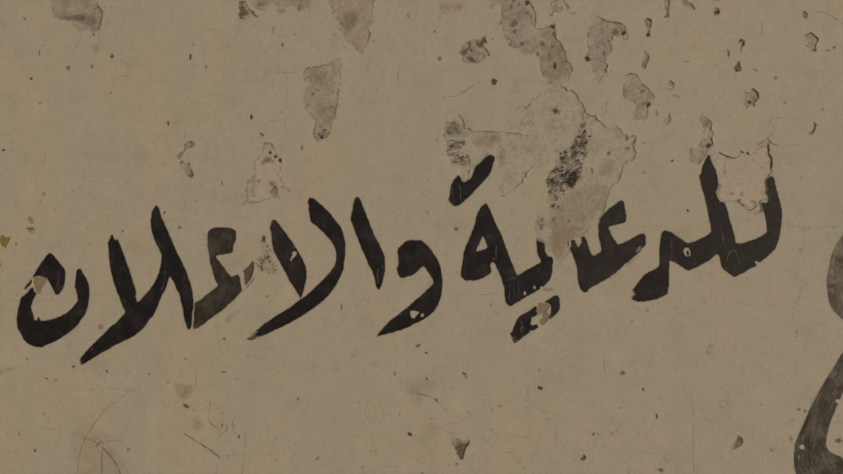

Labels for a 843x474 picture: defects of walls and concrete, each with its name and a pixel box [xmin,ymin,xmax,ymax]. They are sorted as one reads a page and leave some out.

peeling [51,0,106,36]
peeling [238,0,310,19]
peeling [329,0,376,55]
peeling [177,133,195,178]
peeling [241,132,292,206]
peeling [303,58,342,143]
peeling [435,0,645,263]
peeling [622,51,671,125]
peeling [689,115,773,215]
peeling [0,235,17,249]